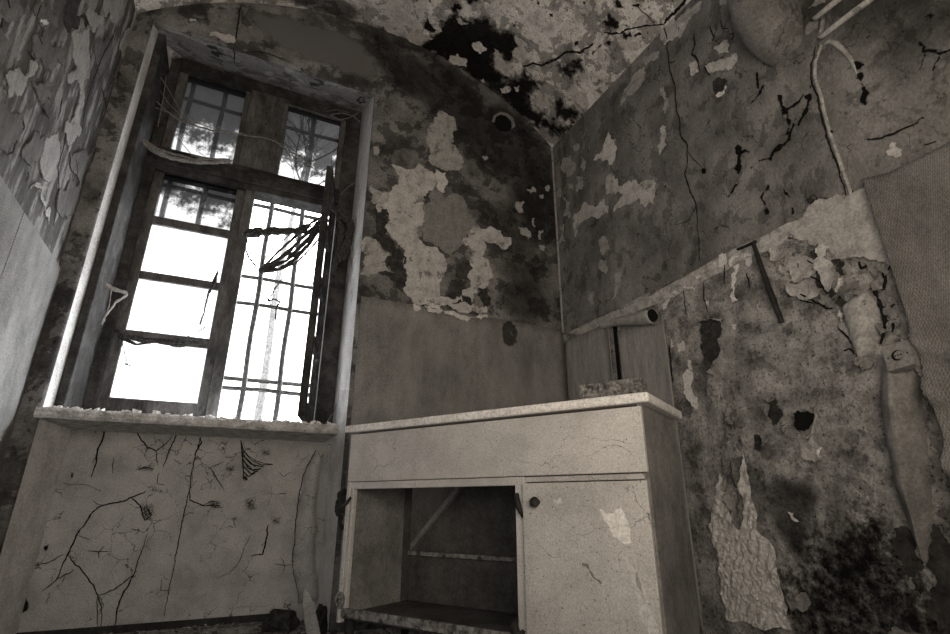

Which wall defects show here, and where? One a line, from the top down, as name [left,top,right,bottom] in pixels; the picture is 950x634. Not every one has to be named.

peeling [0,0,137,225]
peeling [371,0,442,46]
peeling [472,34,541,93]
crack [523,0,734,260]
peeling [360,110,656,318]
crack [683,265,750,315]
peeling [768,237,847,322]
spalling [669,317,736,425]
spalling [764,398,829,463]
crack [36,431,224,627]
crack [218,450,316,604]
leakage [760,483,950,634]